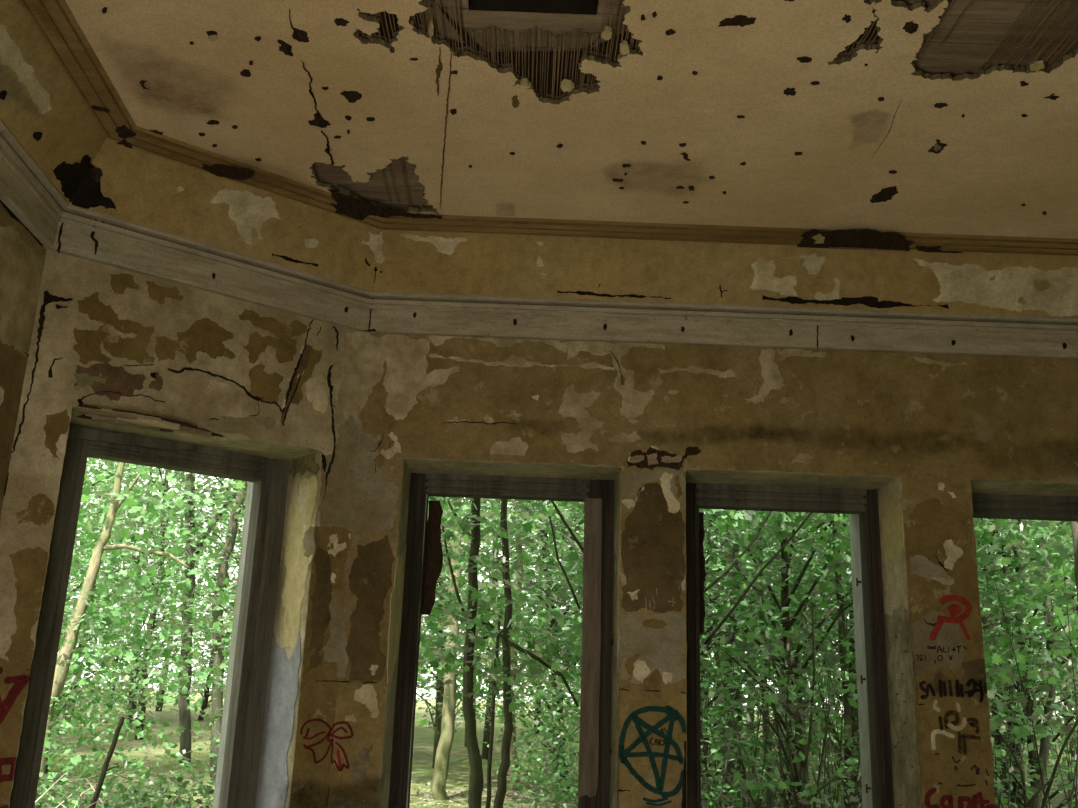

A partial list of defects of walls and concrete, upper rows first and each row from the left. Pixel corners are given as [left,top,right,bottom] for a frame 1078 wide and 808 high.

spalling [334,0,657,108]
spalling [827,0,1078,86]
crack [303,62,334,165]
spalling [53,155,117,211]
spalling [309,156,442,220]
peeling [362,232,385,263]
peeling [750,229,1078,317]
crack [1,291,63,517]
flaking render [73,362,163,401]
crack [78,391,165,405]
crack [125,258,382,498]
peeling [281,330,701,683]